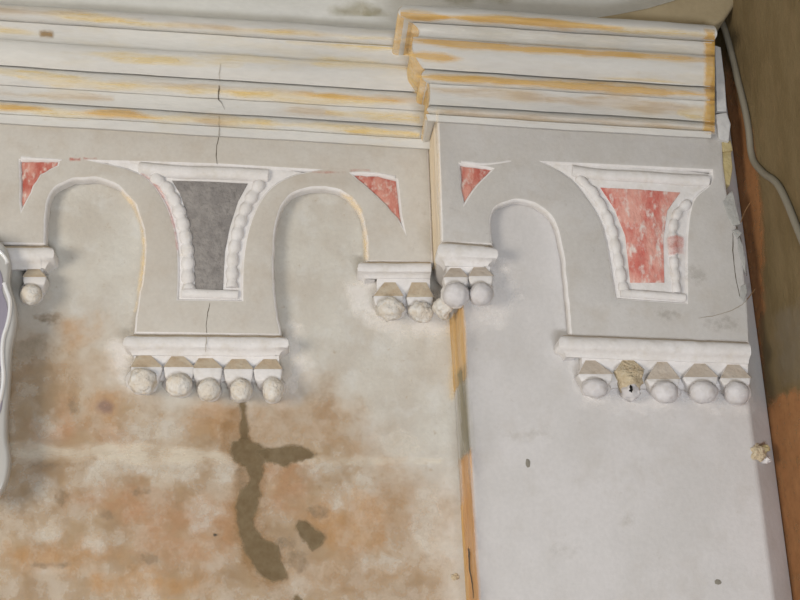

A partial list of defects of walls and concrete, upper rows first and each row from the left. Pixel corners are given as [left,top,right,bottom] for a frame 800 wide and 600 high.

crack [216,65,225,160]
spalling [617,369,644,402]
water stain [0,356,440,600]